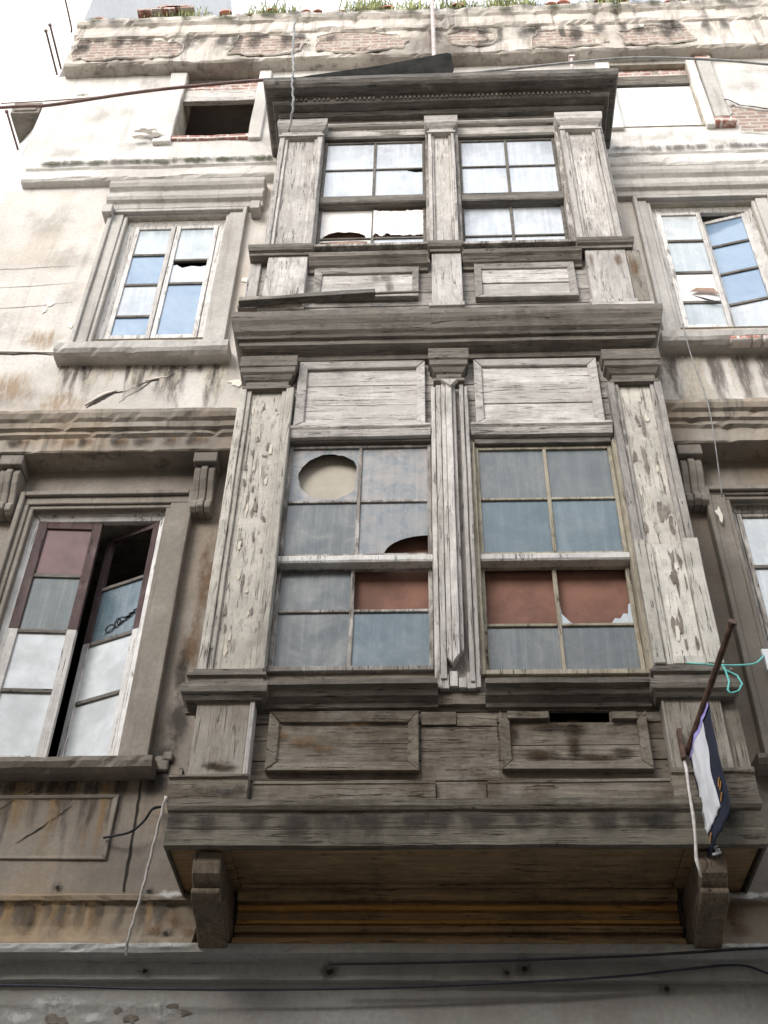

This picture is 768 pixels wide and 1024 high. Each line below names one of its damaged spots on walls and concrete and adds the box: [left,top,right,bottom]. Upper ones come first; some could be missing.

flaking render [70,39,185,62]
flaking render [226,31,410,56]
flaking render [714,100,768,135]
leakage [56,365,184,392]
leakage [658,354,751,399]
leakage [758,356,768,377]
peeling [633,386,675,534]
peeling [243,436,272,521]
peeling [665,550,699,650]
crack [0,781,84,843]
leakage [33,781,99,813]
leakage [138,891,181,921]